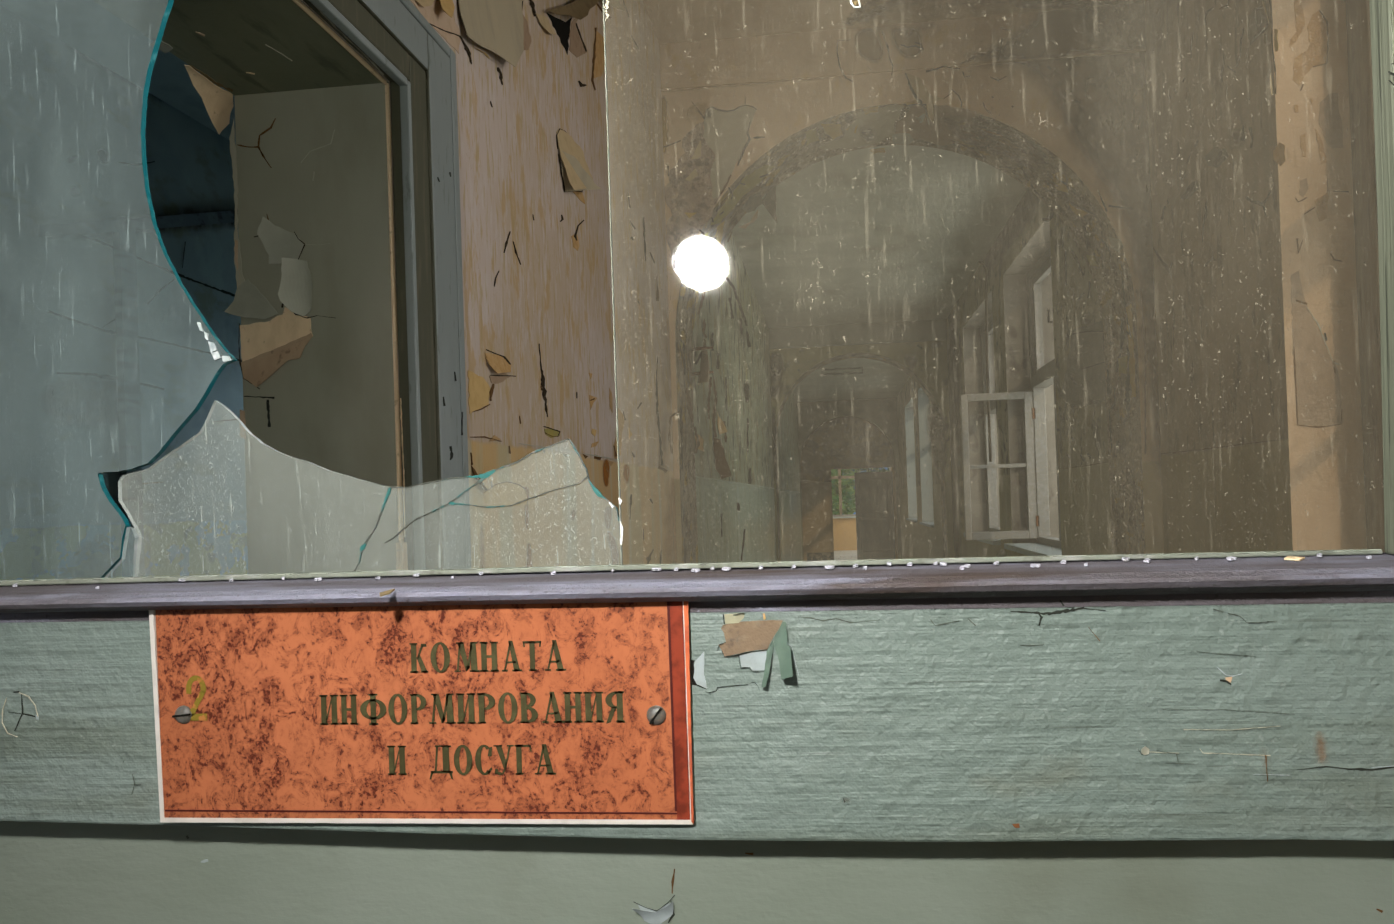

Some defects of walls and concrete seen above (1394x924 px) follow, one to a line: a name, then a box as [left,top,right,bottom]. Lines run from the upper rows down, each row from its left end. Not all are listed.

crack [237,118,276,168]
peeling [184,65,334,439]
peeling [411,0,624,90]
peeling [556,128,601,251]
spalling [665,105,765,270]
damp [846,0,1161,465]
flaking render [1262,0,1349,222]
peeling [449,349,635,491]
damp [927,315,961,558]
peeling [691,613,799,693]
crack [798,615,877,623]
crack [1010,600,1106,646]